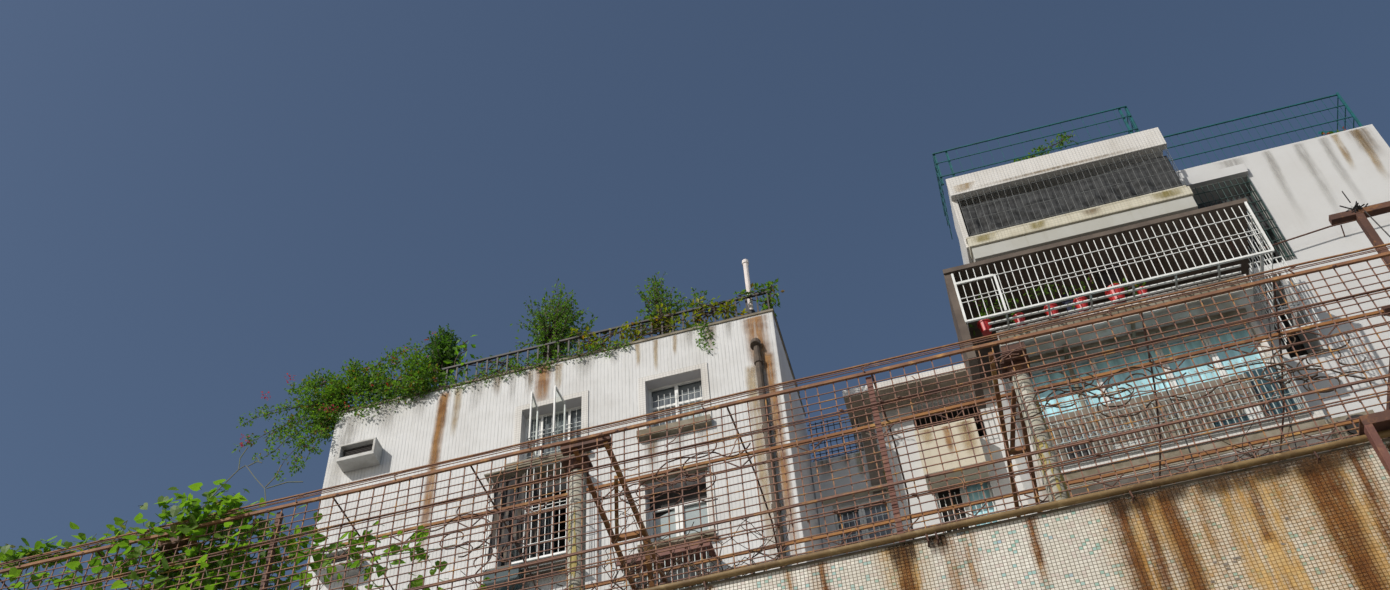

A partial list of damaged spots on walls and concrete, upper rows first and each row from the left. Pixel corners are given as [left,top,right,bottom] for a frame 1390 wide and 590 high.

rust [1333,129,1377,163]
rust [422,388,460,524]
rust [747,316,791,512]
rust [878,532,979,590]
rust [1028,517,1047,579]
rust [1108,451,1390,590]